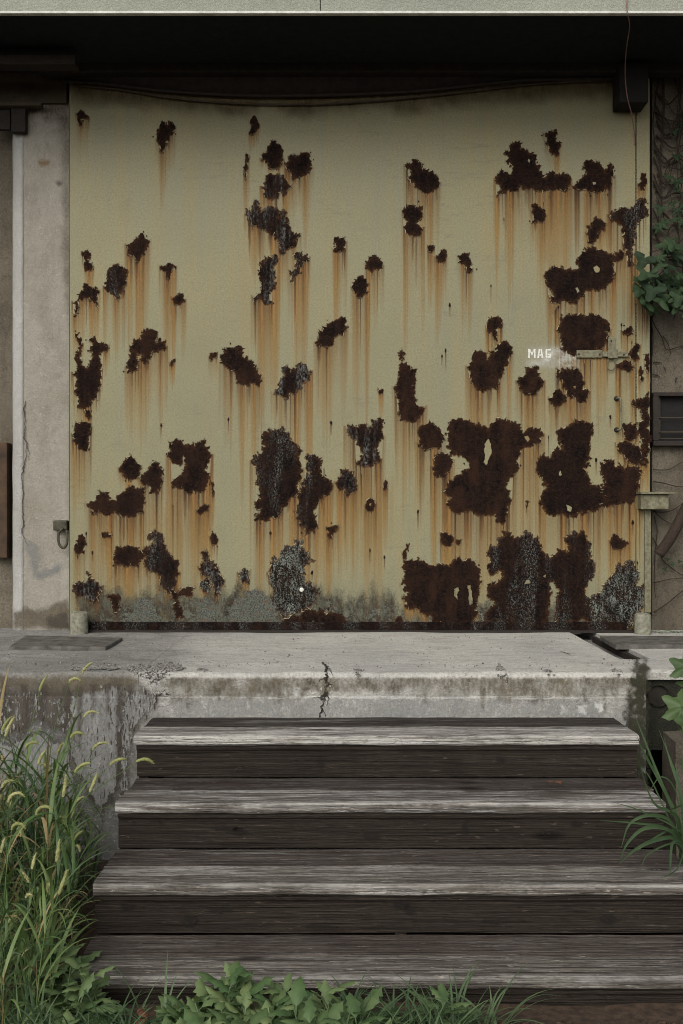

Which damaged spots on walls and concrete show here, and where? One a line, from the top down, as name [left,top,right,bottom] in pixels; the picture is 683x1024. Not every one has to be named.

rust [71,231,186,475]
rust [209,129,652,630]
rust [72,438,225,620]
crack [313,662,333,717]
leakage [168,677,630,717]